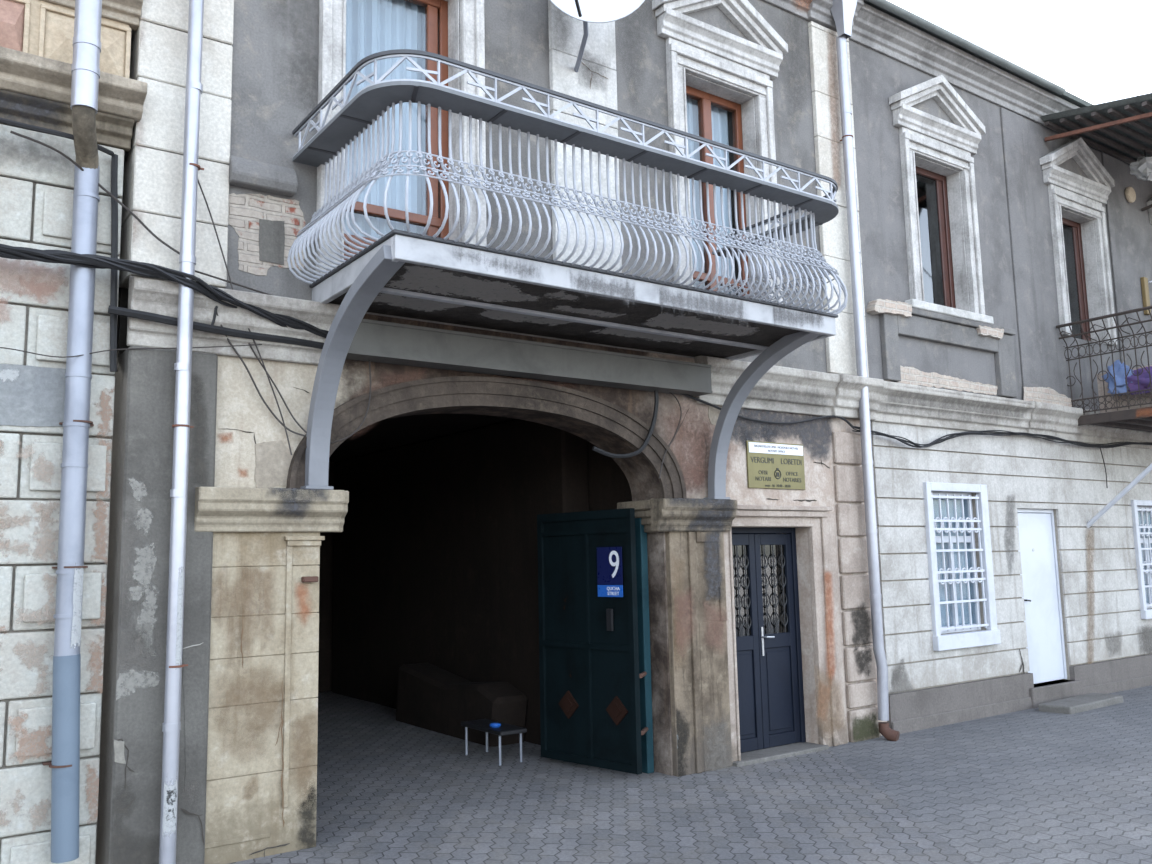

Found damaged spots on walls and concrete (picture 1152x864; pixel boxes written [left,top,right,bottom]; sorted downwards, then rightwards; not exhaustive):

flaking render [228,193,305,276]
water stain [272,488,326,517]
peeling [70,389,160,700]
corrosion [819,574,834,717]
peeling [85,765,99,821]
water stain [299,787,317,849]